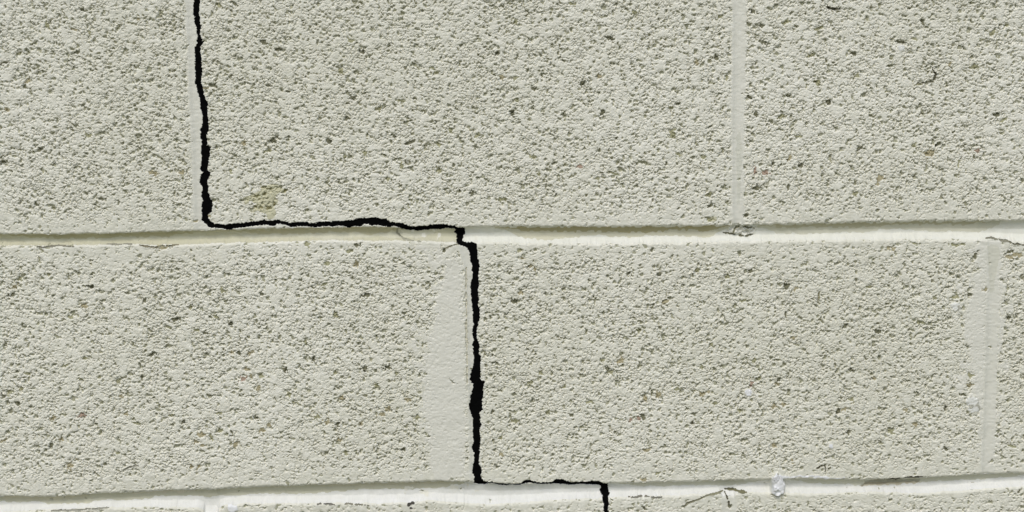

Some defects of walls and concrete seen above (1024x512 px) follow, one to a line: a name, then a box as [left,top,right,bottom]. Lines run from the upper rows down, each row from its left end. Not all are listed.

crack [193,0,747,512]